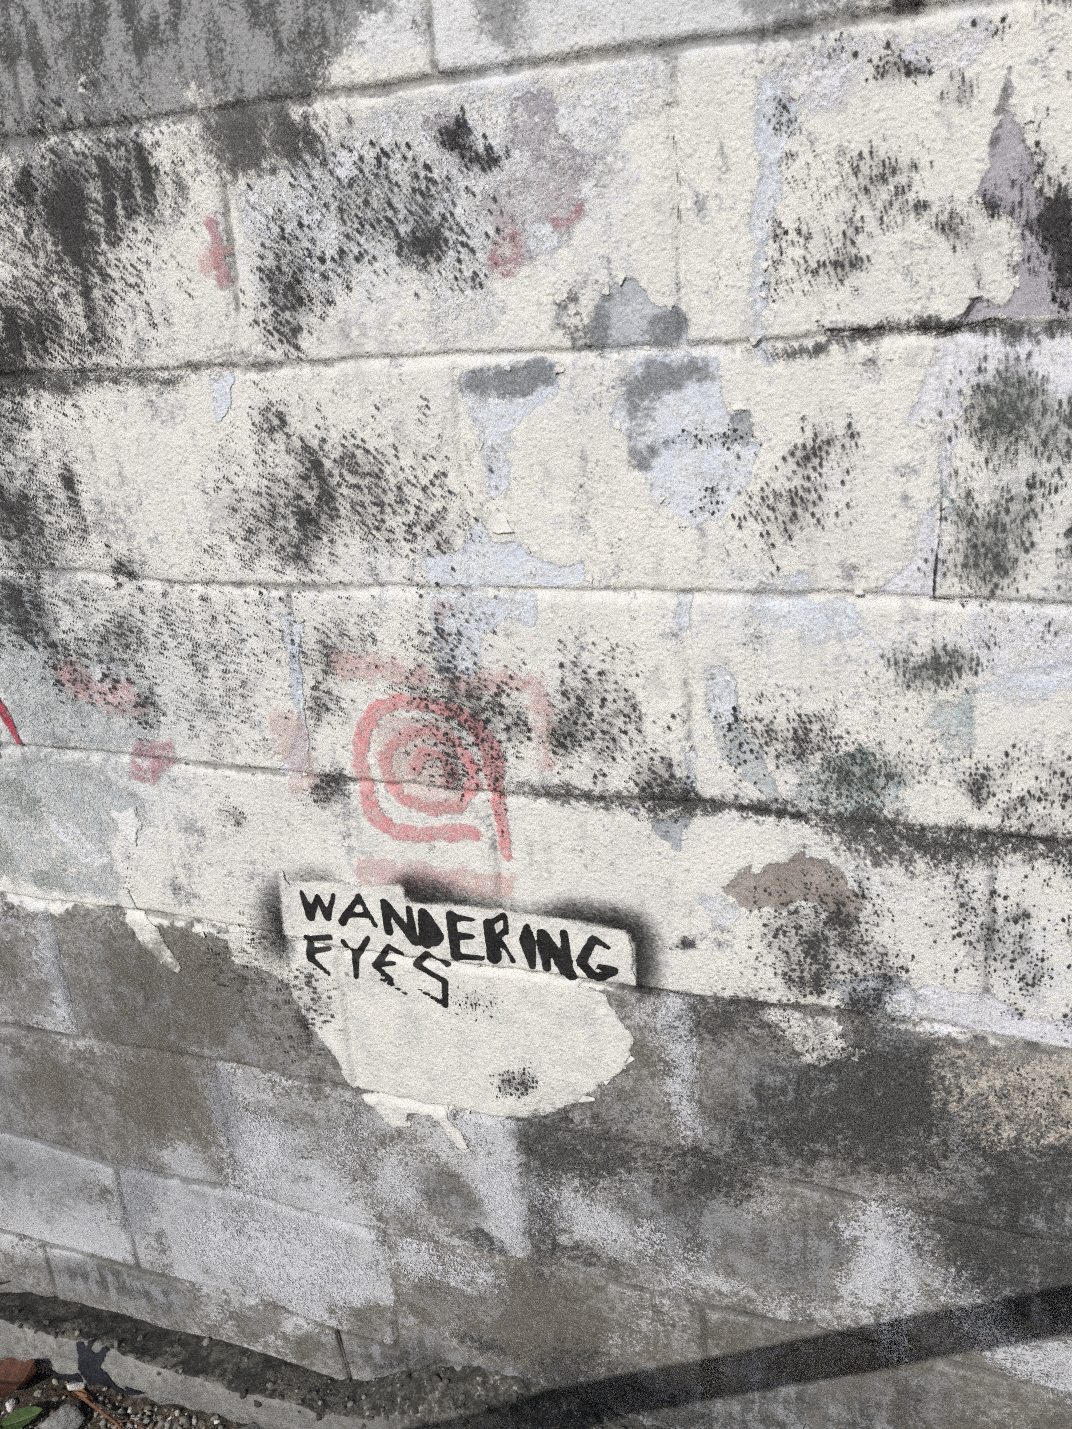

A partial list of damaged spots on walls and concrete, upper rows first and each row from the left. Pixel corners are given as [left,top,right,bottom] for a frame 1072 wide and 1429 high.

peeling [232,54,662,352]
water stain [924,68,979,108]
peeling [422,356,593,683]
peeling [589,275,762,531]
water stain [712,126,1072,631]
peeling [750,66,1072,646]
water stain [876,626,1001,714]
water stain [203,775,252,839]
water stain [295,765,354,809]
peeling [192,921,635,1154]
water stain [662,935,698,950]
peeling [765,972,1072,1163]